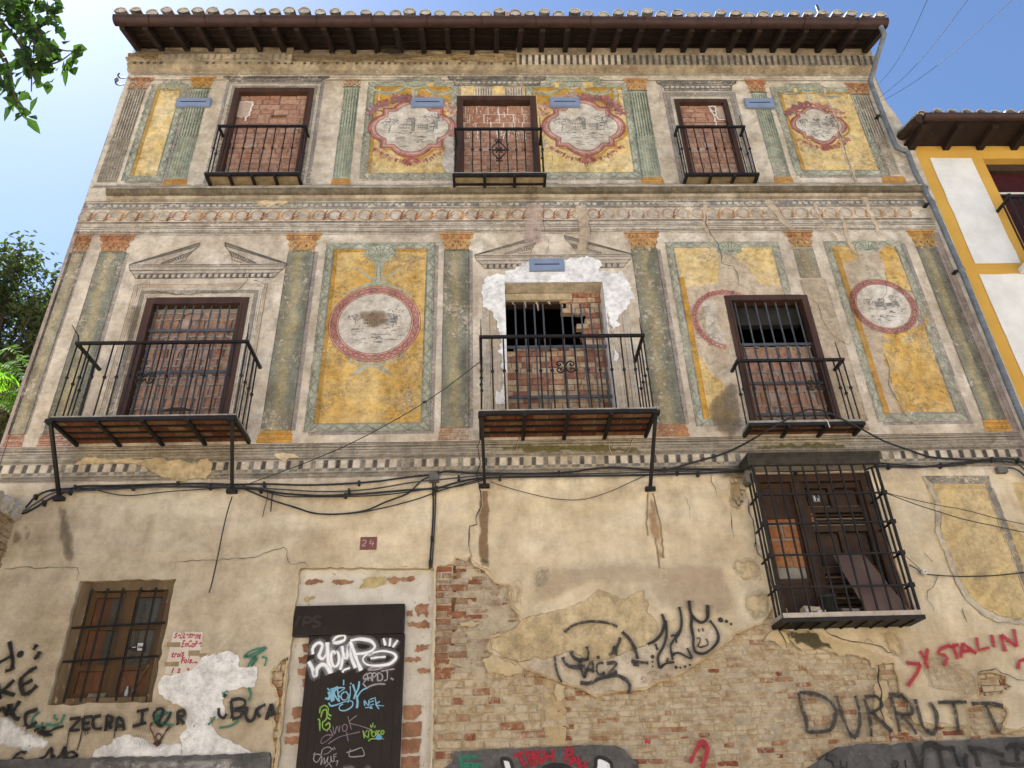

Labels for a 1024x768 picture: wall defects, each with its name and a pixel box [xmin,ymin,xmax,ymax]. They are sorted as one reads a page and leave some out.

peeling [495,384,505,404]
peeling [76,457,213,482]
water stain [61,511,72,555]
rust [479,491,489,565]
rust [646,492,664,568]
crack [175,547,309,567]
peeling [304,576,415,602]
spalling [401,555,1024,768]